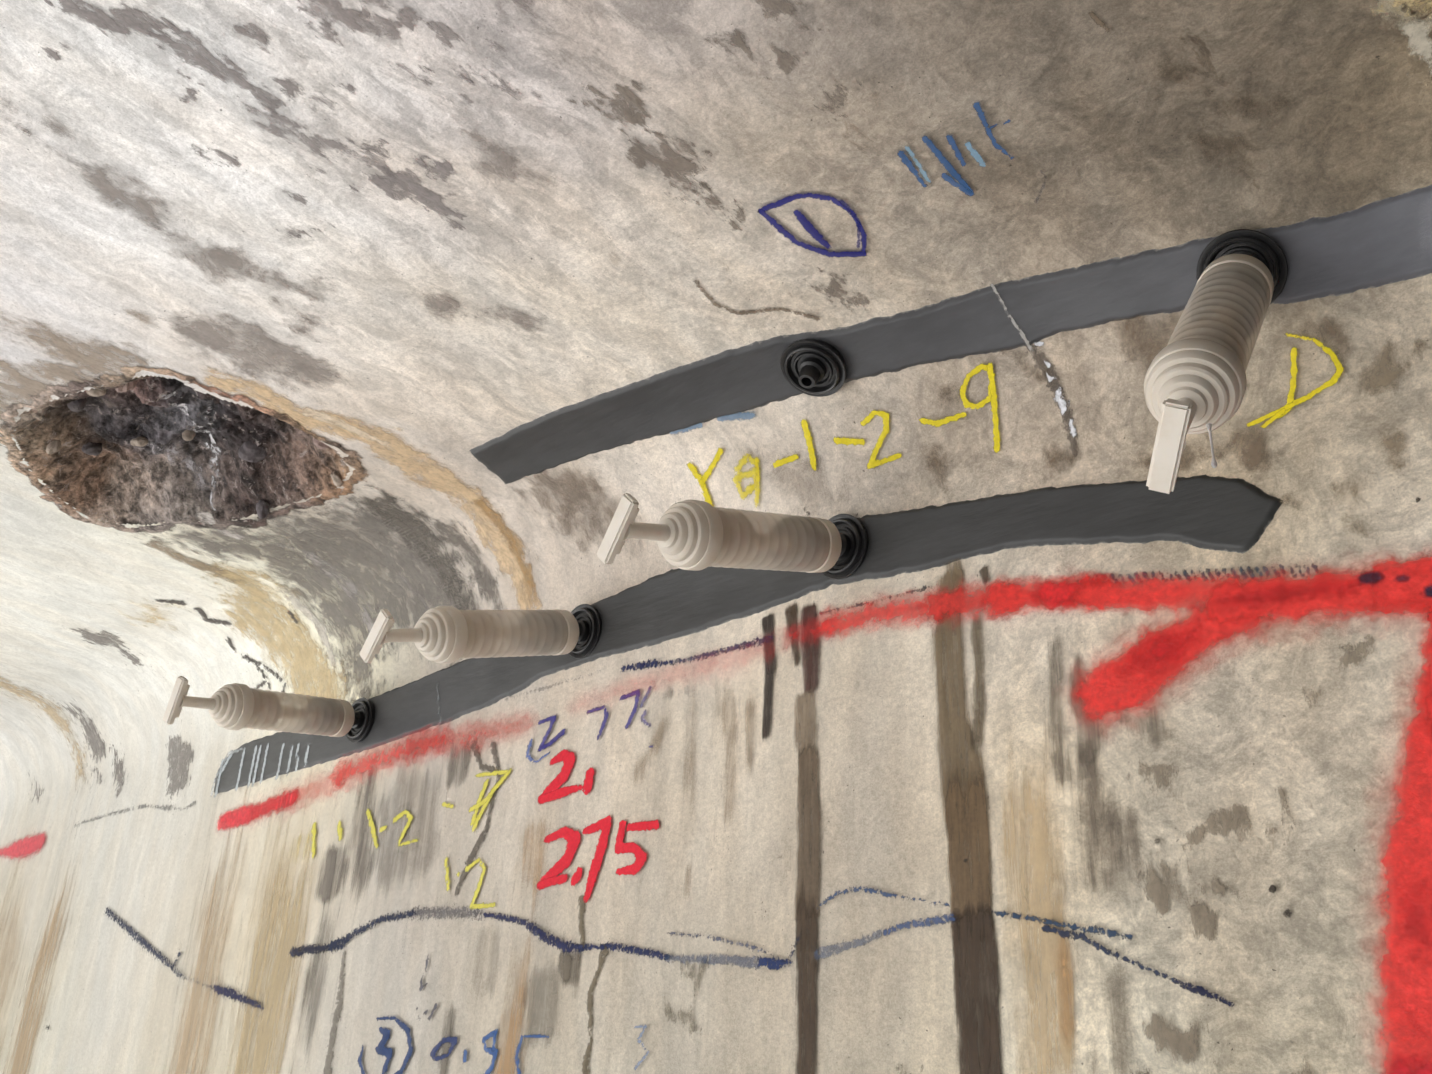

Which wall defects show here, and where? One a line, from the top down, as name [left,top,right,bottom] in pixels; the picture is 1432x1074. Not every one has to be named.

spalling [0,366,368,533]
crack [1025,342,1077,457]
damp [937,561,988,596]
damp [746,604,820,1074]
damp [934,611,1002,1074]